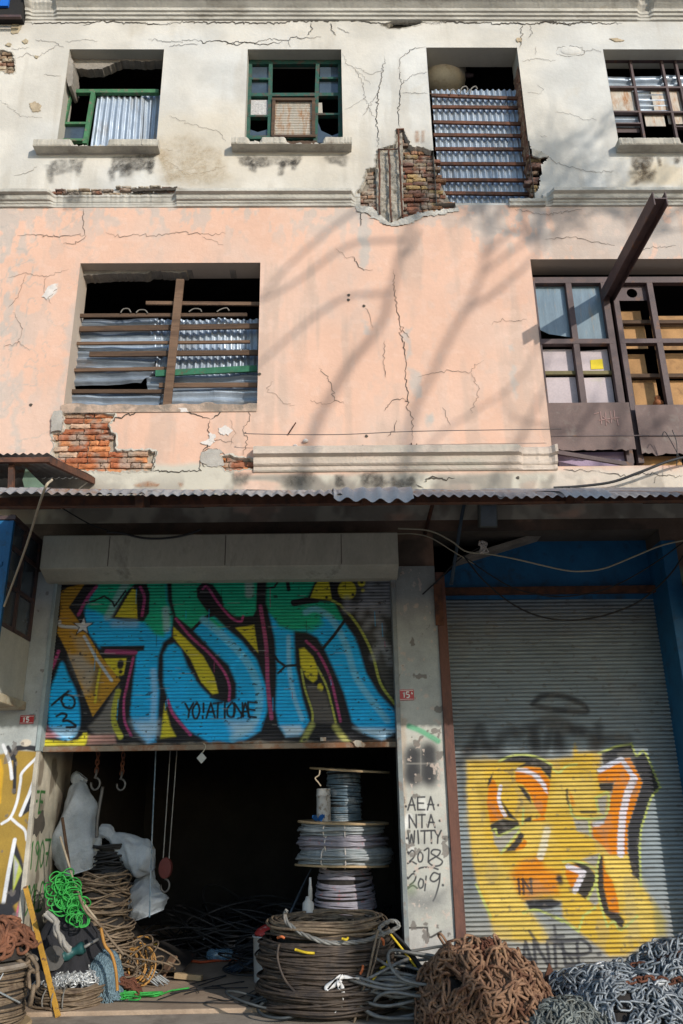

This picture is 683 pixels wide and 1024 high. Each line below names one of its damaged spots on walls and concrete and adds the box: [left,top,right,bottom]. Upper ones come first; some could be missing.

crack [15,20,618,147]
spalling [52,185,178,195]
spalling [355,128,459,226]
crack [6,271,62,349]
crack [367,271,480,436]
spalling [50,410,158,475]
spalling [200,425,254,473]
leakage [362,473,415,487]